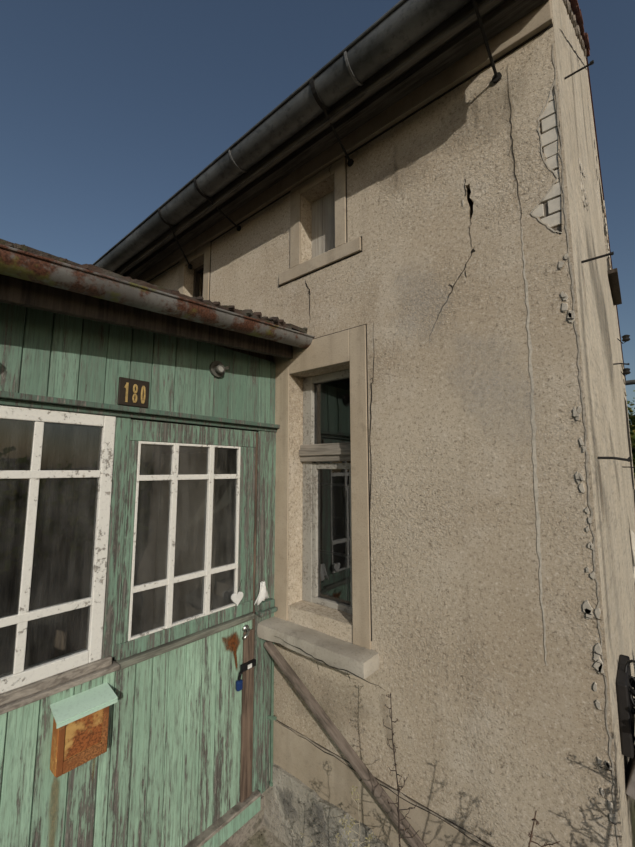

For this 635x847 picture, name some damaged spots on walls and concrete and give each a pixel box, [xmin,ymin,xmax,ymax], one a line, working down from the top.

crack [429,246,475,336]
spalling [530,43,620,847]